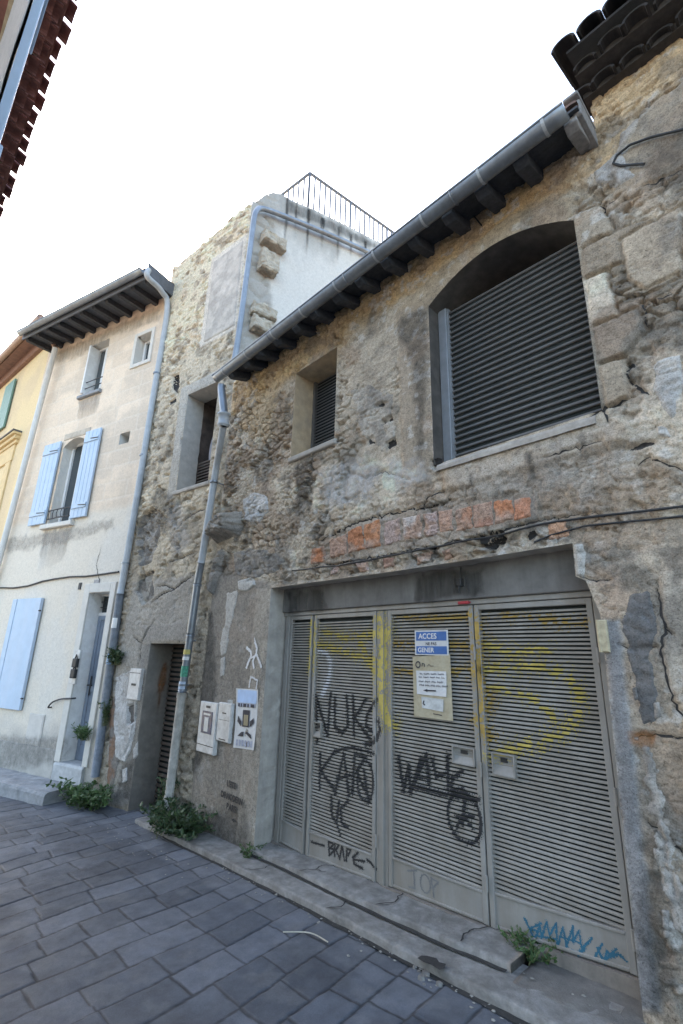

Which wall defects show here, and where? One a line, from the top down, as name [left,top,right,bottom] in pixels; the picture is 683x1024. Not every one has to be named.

crack [549,366,650,457]
crack [639,457,683,471]
crack [622,586,683,739]
flaking render [107,670,138,787]
spalling [633,735,683,938]